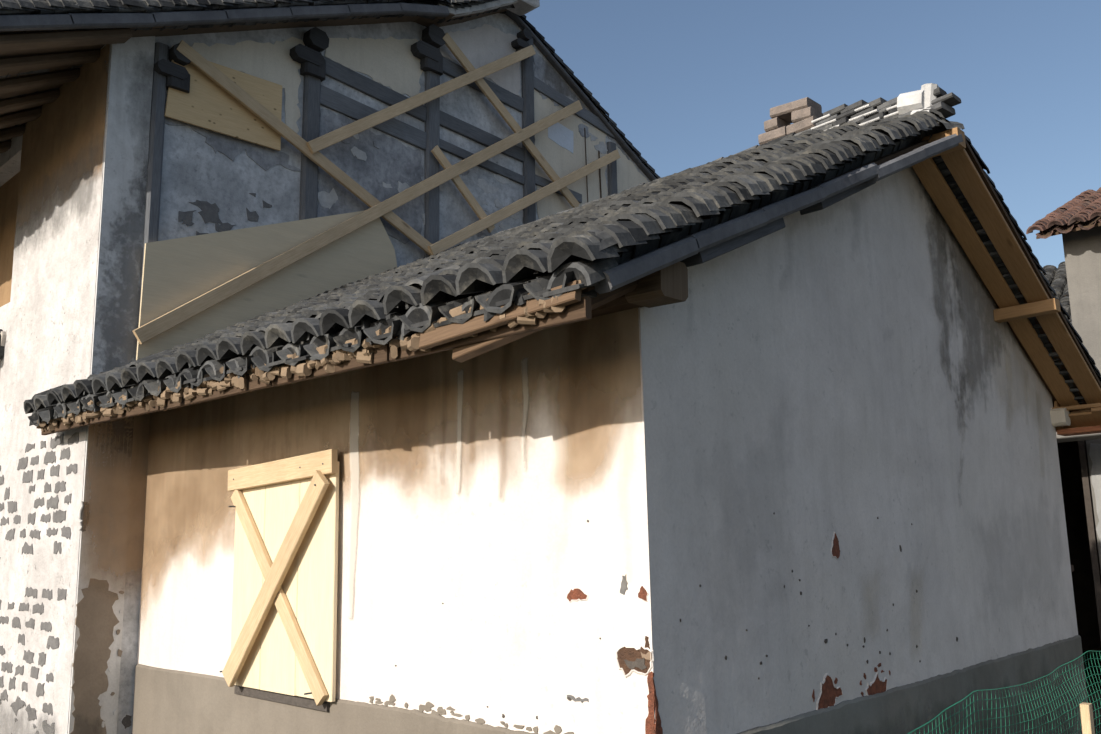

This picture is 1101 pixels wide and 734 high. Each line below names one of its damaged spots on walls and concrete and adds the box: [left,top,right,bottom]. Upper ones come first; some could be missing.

flaking render [165,117,301,171]
flaking render [178,200,235,235]
flaking render [246,193,272,222]
leakage [85,308,641,618]
flaking render [0,432,88,555]
spalling [830,531,841,560]
spalling [566,587,589,603]
flaking render [0,578,132,734]
flaking render [369,694,486,724]
flaking render [500,714,574,734]
spalling [812,673,843,710]
spalling [860,651,891,697]